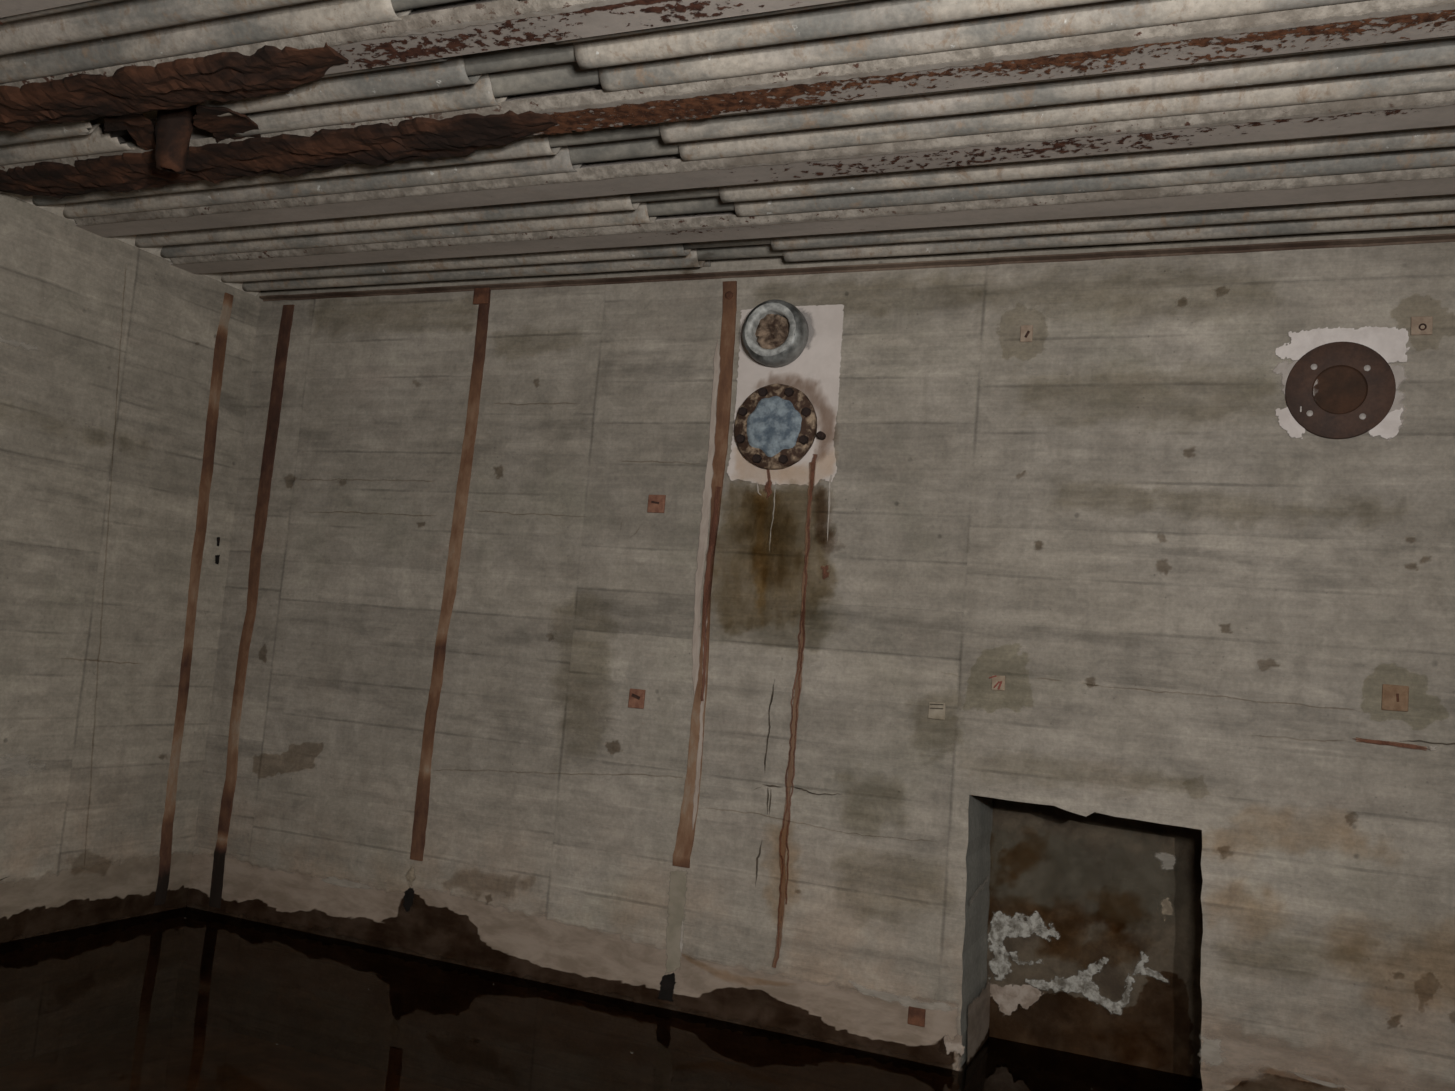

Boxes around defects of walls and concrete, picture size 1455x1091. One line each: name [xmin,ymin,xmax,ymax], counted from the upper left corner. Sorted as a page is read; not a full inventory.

rust [336,0,765,69]
rust [532,9,1455,135]
rust [193,104,261,143]
rust [753,109,1416,182]
peeling [1273,361,1305,439]
peeling [1368,364,1406,439]
rust [772,454,829,968]
water stain [0,828,1178,1071]
water stain [1201,1024,1455,1091]